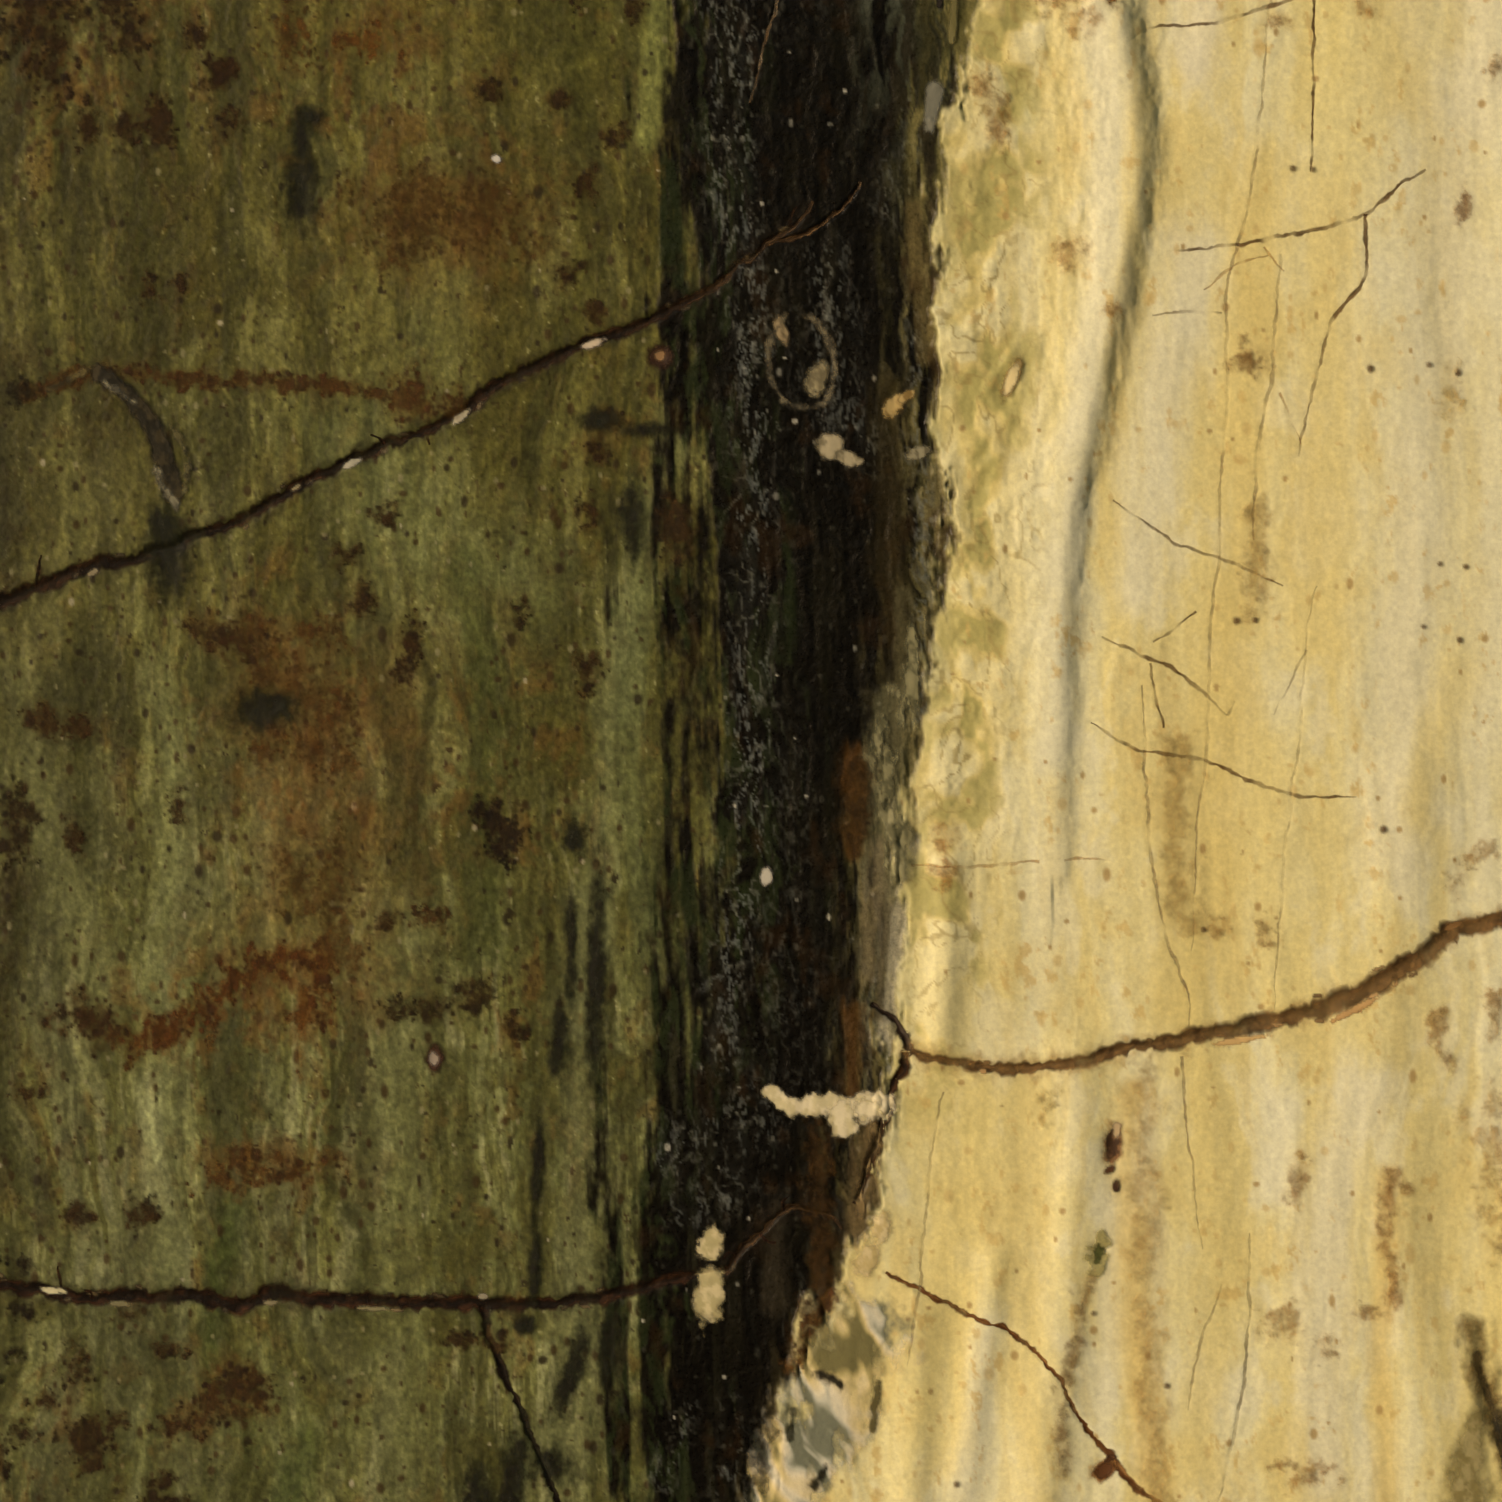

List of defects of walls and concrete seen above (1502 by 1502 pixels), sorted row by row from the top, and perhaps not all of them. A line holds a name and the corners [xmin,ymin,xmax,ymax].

corrosion [0,0,179,149]
corrosion [185,16,239,88]
crack [1157,0,1316,168]
crack [1187,227,1324,251]
crack [1322,176,1415,352]
crack [0,181,861,610]
water stain [617,488,645,553]
crack [1113,500,1192,550]
crack [1091,611,1253,783]
crack [1296,793,1350,801]
corrosion [42,899,351,1071]
crack [0,911,1502,1502]